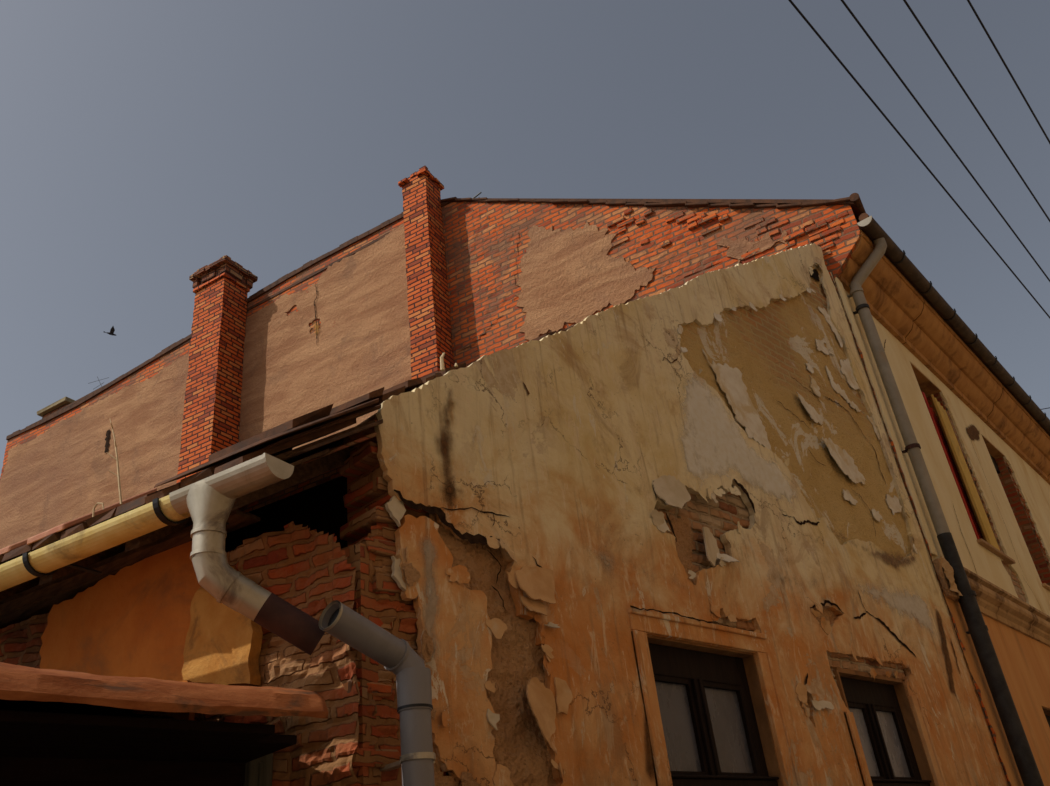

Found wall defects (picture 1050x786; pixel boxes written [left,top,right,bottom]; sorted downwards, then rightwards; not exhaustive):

flaking render [367,495,406,542]
flaking render [342,646,401,786]
flaking render [368,546,434,672]
flaking render [429,513,573,786]